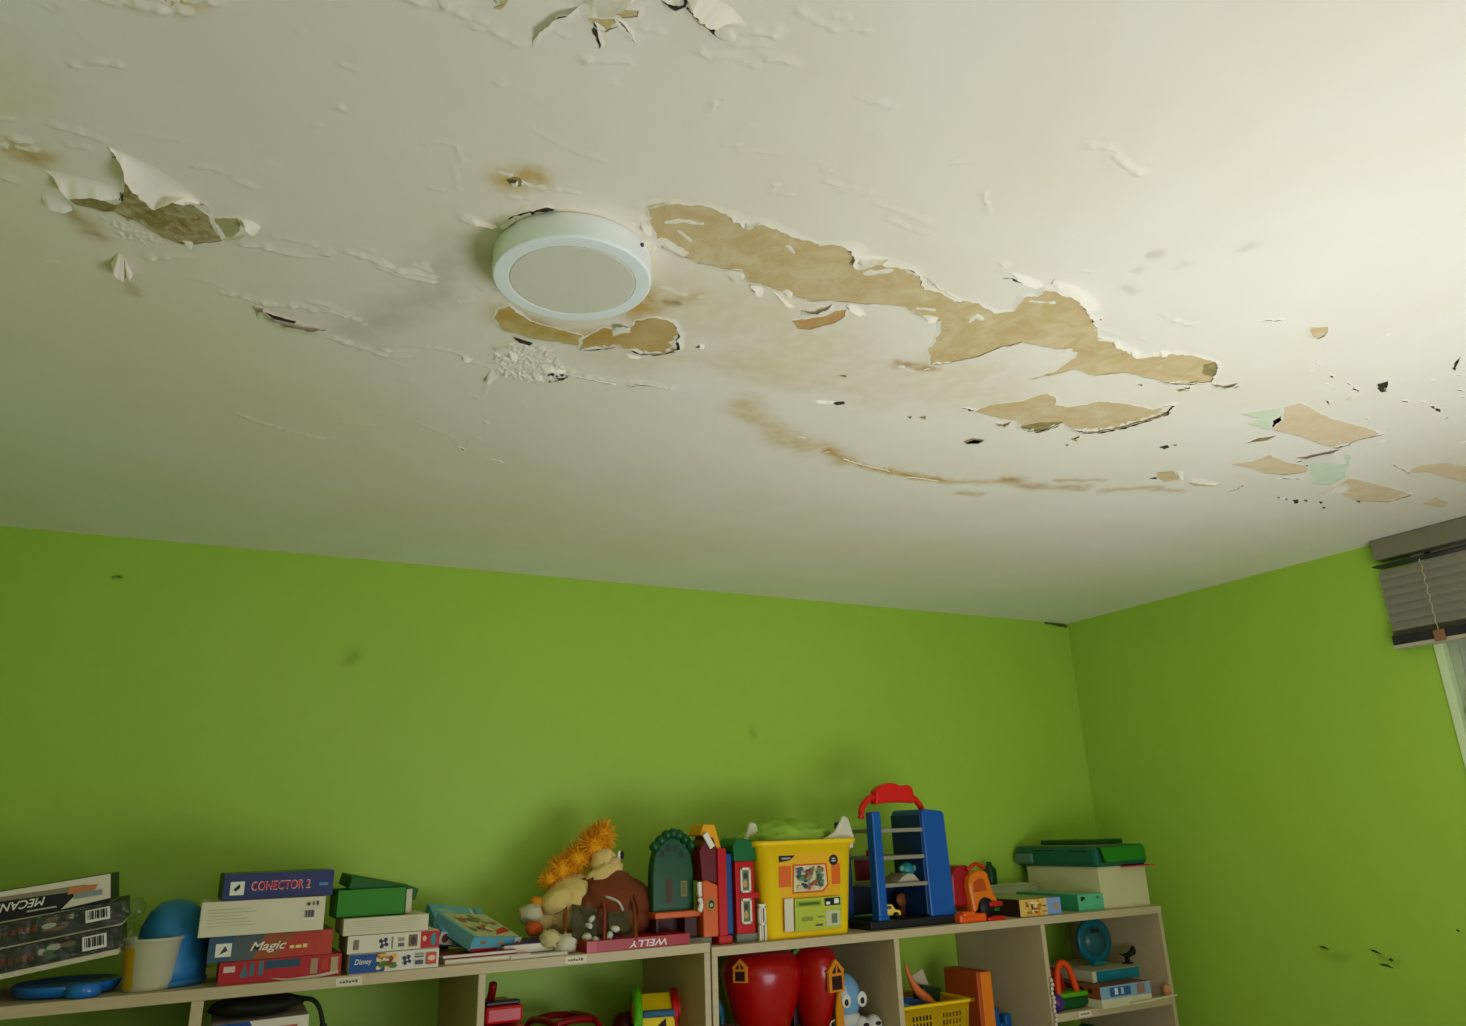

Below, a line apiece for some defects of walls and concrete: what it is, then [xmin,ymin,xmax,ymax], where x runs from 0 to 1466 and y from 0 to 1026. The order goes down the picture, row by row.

peeling [398,0,805,89]
peeling [41,147,261,283]
peeling [453,168,583,232]
peeling [405,261,687,386]
peeling [645,199,1239,446]
peeling [1230,401,1466,507]